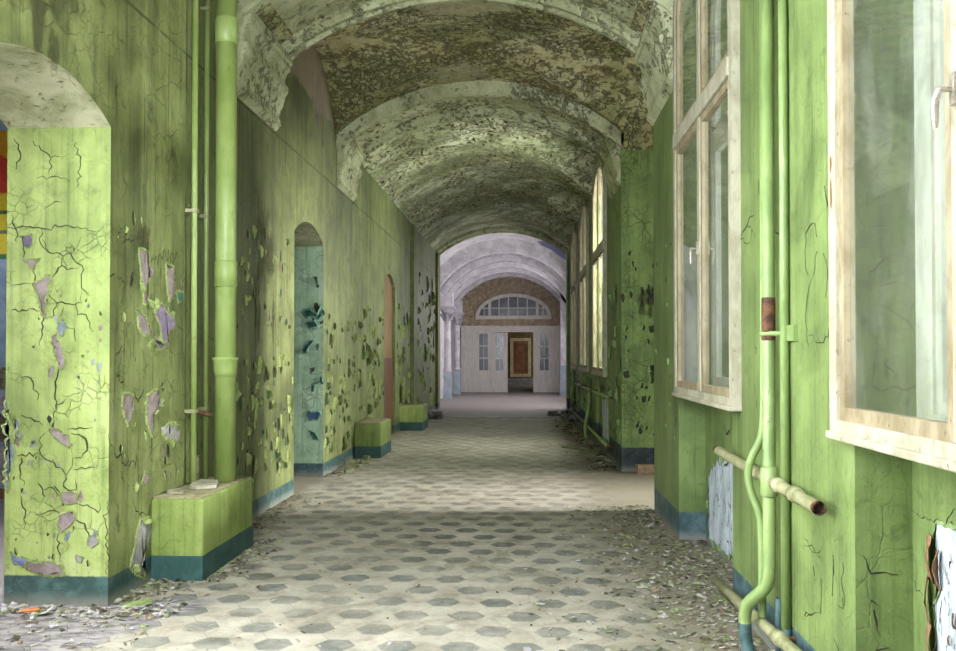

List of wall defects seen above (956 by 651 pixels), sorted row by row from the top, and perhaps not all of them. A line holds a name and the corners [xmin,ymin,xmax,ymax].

peeling [21,233,68,380]
crack [18,362,152,574]
crack [116,333,144,402]
peeling [129,515,154,580]
peeling [121,382,182,481]
peeling [123,247,184,352]
peeling [236,338,294,487]
peeling [301,272,437,454]
peeling [706,456,733,563]
crack [804,509,954,625]
crack [871,600,888,651]
peeling [923,520,956,651]